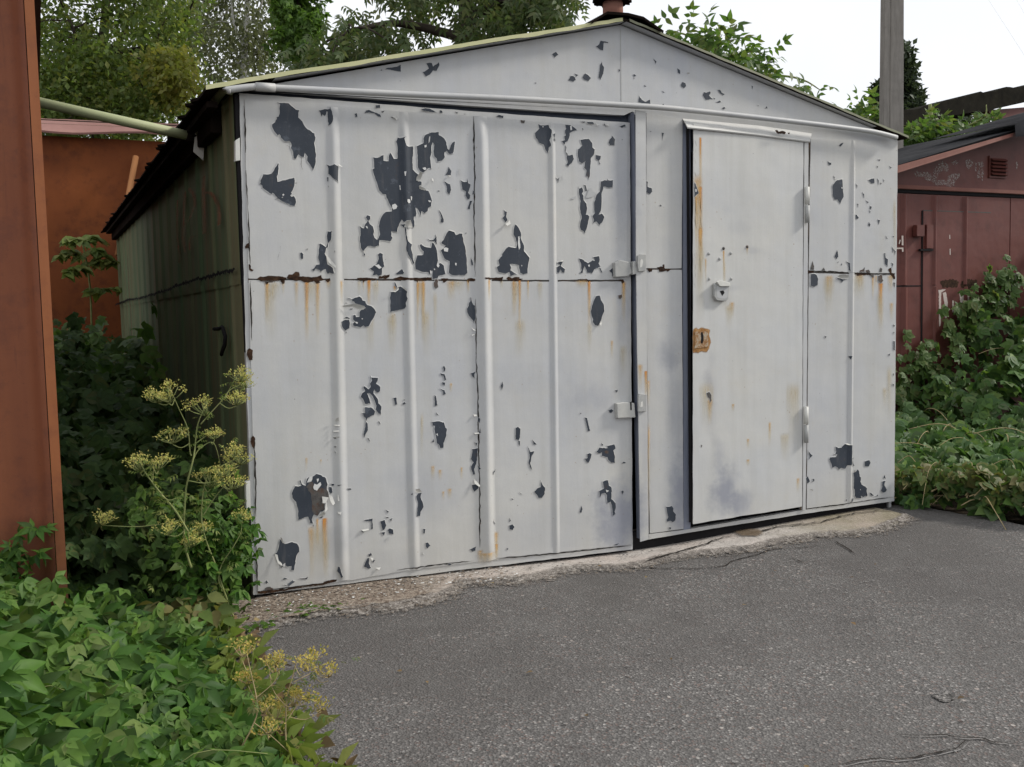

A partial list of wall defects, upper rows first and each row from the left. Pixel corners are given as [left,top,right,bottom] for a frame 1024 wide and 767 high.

peeling [259,163,297,206]
peeling [271,102,342,187]
peeling [534,121,626,234]
peeling [341,131,474,333]
peeling [496,210,530,277]
corrosion [249,264,342,308]
corrosion [468,277,529,298]
peeling [360,376,406,442]
peeling [432,366,448,449]
peeling [291,473,351,527]
peeling [829,443,887,502]
spalling [231,537,429,628]